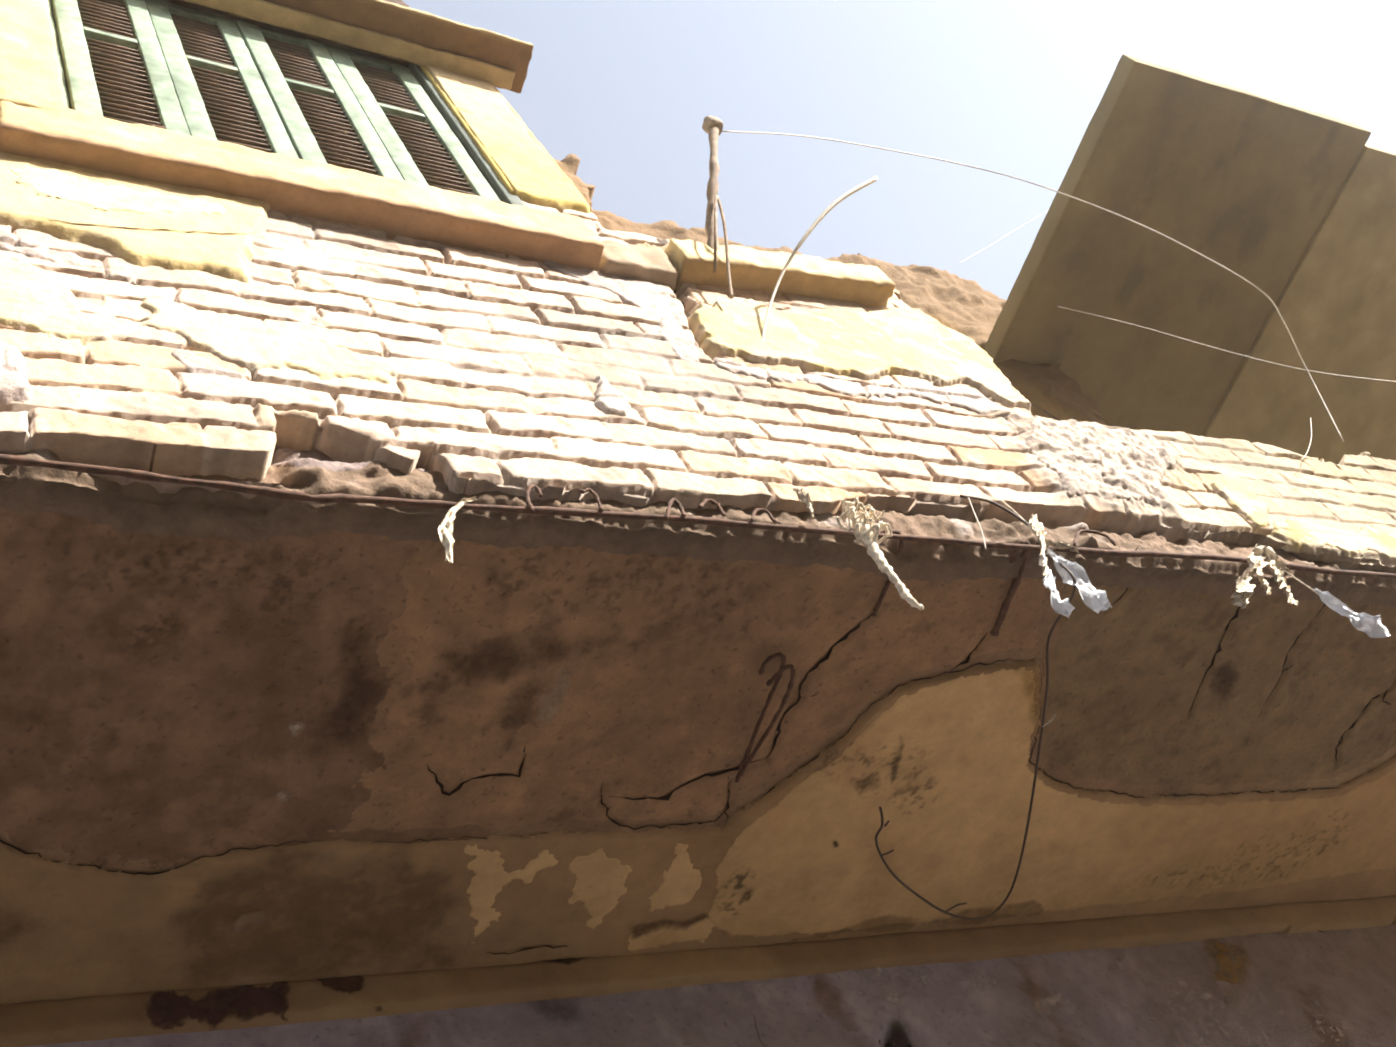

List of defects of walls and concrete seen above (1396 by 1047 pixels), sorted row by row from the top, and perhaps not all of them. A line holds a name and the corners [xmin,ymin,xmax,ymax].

flaking render [0,253,401,384]
flaking render [687,289,1032,414]
spalling [271,445,374,472]
spalling [0,454,855,537]
spalling [878,529,1248,636]
flaking render [1210,482,1396,578]
crack [354,598,1396,844]
peeling [627,652,1396,951]
crack [0,839,321,875]
peeling [464,836,633,943]